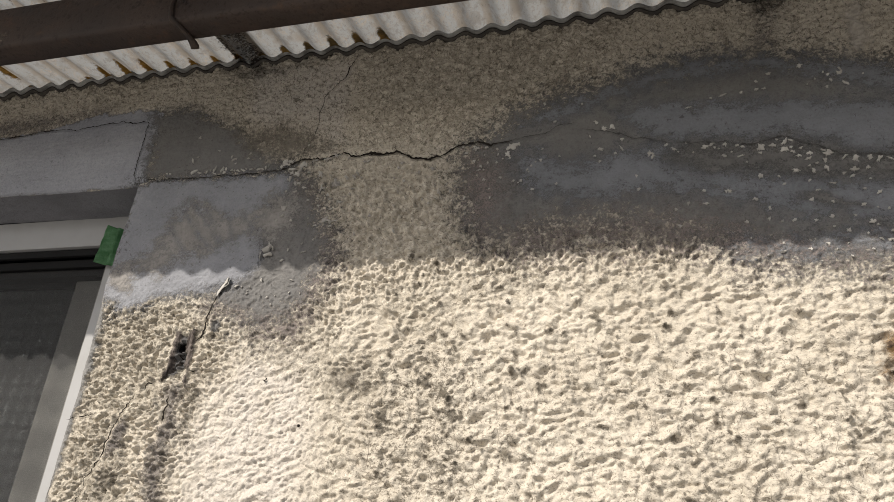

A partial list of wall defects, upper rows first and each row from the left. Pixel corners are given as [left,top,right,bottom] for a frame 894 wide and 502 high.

water stain [237,120,349,163]
crack [1,54,894,183]
hole [160,328,198,392]
crack [196,292,221,341]
water stain [197,174,349,351]
water stain [449,142,894,299]
crack [68,382,169,502]